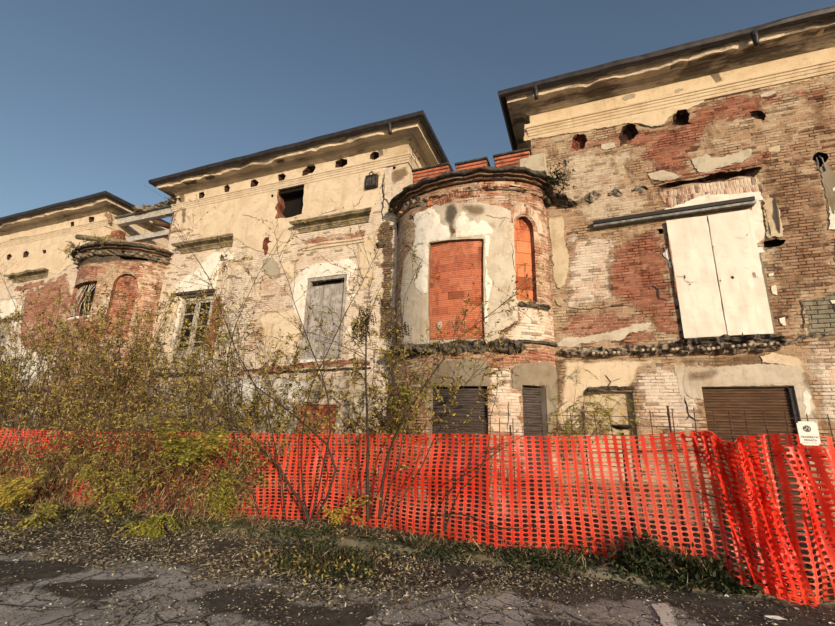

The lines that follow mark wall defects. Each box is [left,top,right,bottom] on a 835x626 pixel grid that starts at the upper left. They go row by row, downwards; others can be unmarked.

peeling [402,207,493,322]
water stain [446,205,483,235]
peeling [549,217,569,288]
flaking render [485,228,682,368]
flaking render [562,86,835,326]